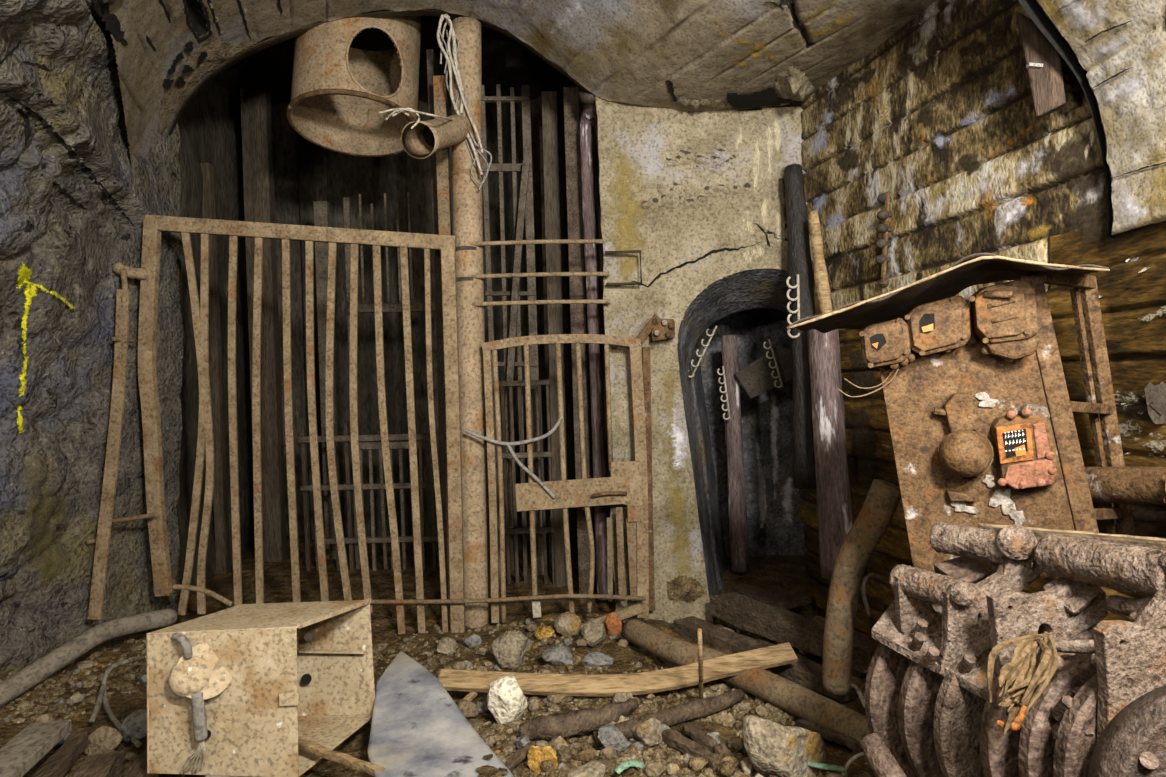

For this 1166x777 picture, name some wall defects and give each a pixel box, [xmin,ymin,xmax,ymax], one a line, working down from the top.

crack [765,0,815,48]
spalling [158,0,260,135]
spalling [677,66,816,111]
crack [632,223,788,287]